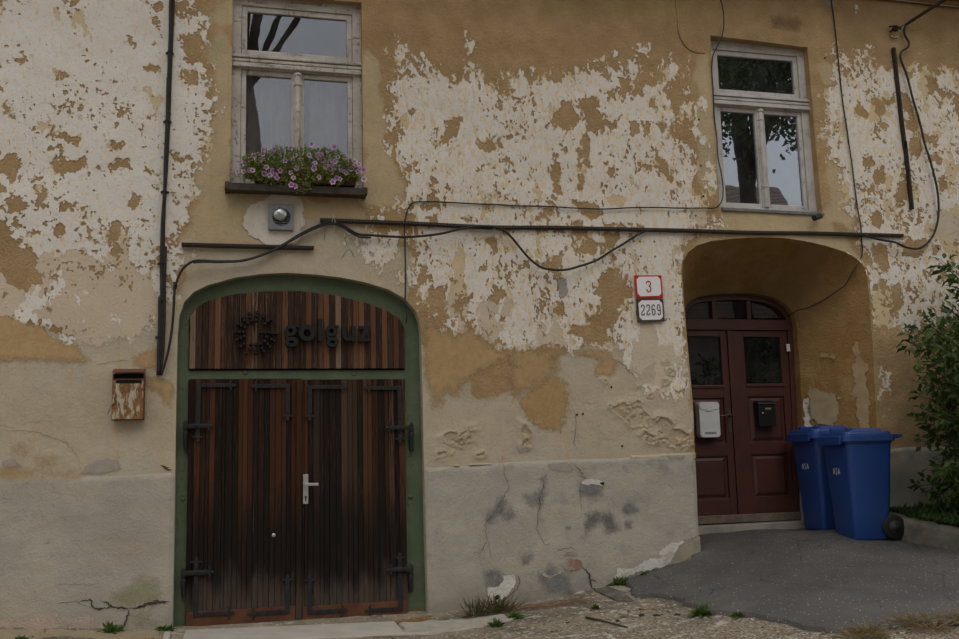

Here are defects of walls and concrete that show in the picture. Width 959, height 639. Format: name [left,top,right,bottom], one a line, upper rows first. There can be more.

peeling [0,0,227,350]
peeling [343,30,728,466]
peeling [816,39,959,339]
crack [57,584,169,628]
spalling [488,574,516,603]
spalling [615,536,701,579]